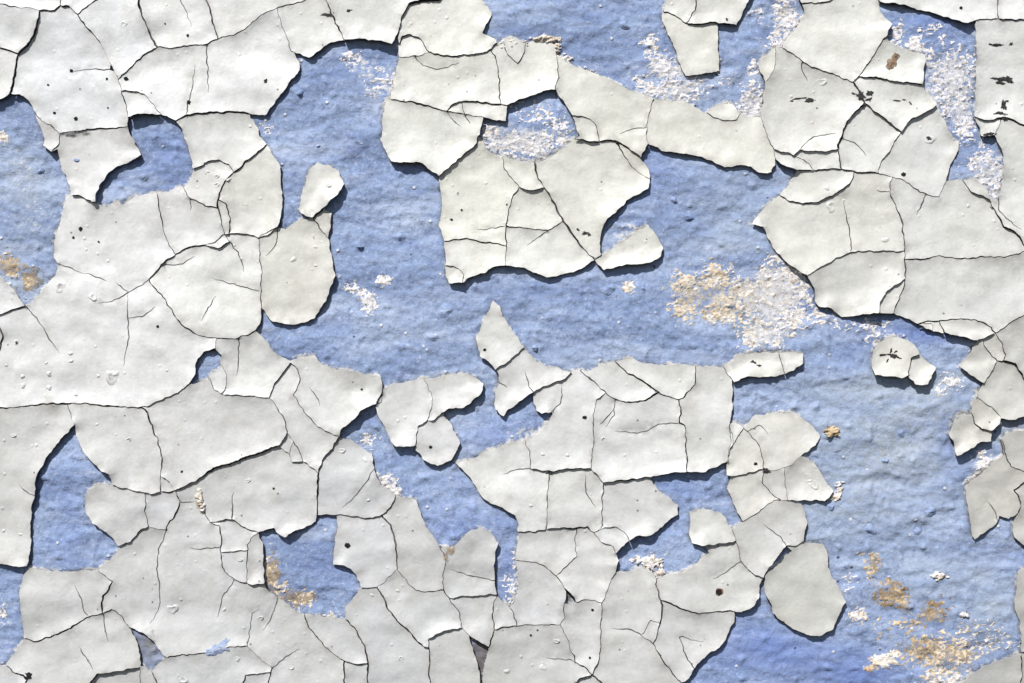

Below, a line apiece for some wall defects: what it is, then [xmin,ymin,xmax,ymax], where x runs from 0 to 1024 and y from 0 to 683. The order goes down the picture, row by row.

crack [0,0,345,153]
spalling [339,49,362,72]
crack [0,144,733,683]
spalling [342,275,393,317]
crack [390,0,526,176]
crack [572,99,654,179]
peeling [689,413,846,636]
peeling [662,0,1024,456]
crack [707,38,1024,314]
crack [917,315,1024,380]
peeling [963,431,1024,545]
spalling [845,551,1024,683]